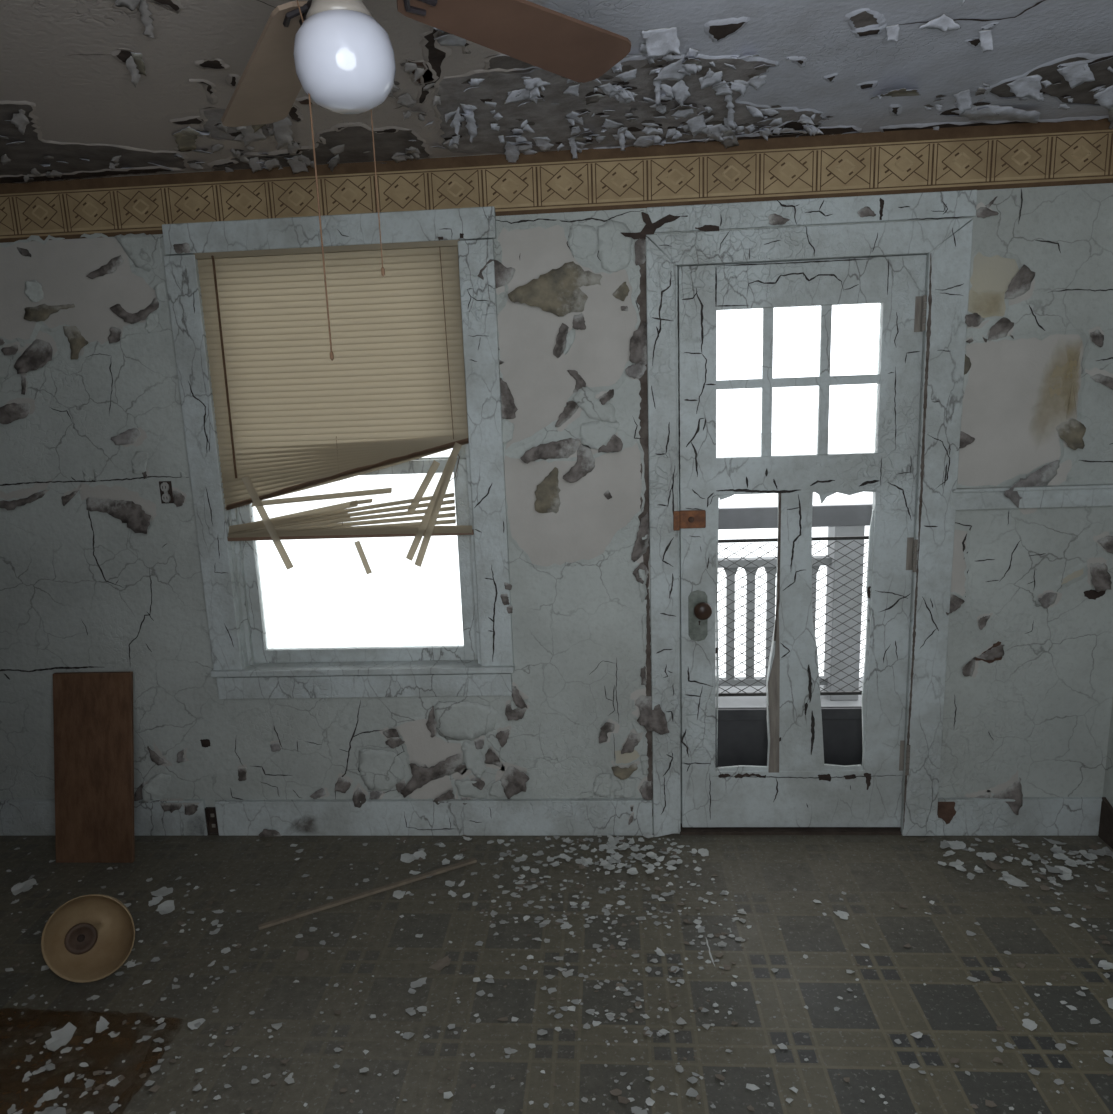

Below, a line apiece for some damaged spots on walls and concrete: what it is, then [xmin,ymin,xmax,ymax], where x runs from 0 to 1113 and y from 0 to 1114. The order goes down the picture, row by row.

crack [899,0,1046,25]
peeling [0,26,862,184]
peeling [856,52,1113,132]
crack [497,210,643,261]
peeling [0,233,191,424]
peeling [478,212,719,652]
crack [634,200,1046,616]
peeling [957,247,1113,515]
crack [485,568,497,660]
crack [875,590,939,663]
peeling [310,682,530,808]
crack [657,643,901,819]